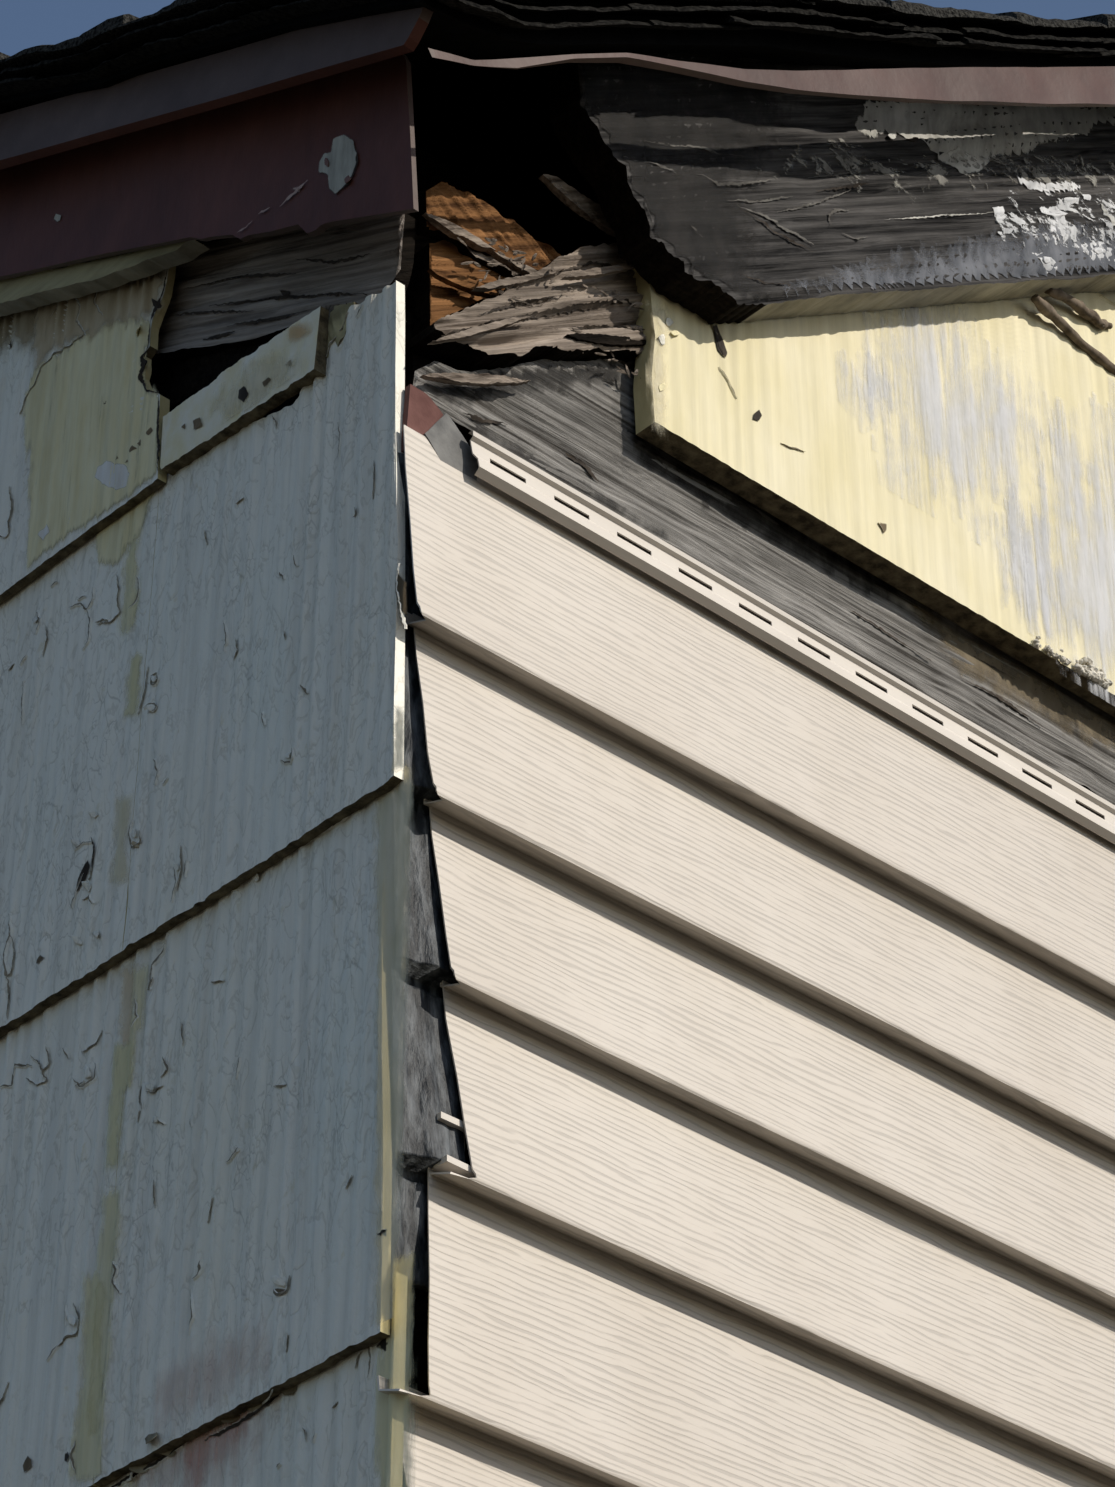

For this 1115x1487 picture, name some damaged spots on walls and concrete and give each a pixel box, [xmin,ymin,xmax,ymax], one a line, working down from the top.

peeling [319,135,358,194]
peeling [785,100,1115,273]
spalling [325,302,364,358]
leakage [428,360,635,402]
peeling [19,272,167,631]
leakage [469,424,621,514]
leakage [633,433,896,601]
spalling [395,563,408,629]
leakage [915,605,1115,745]
peeling [69,838,95,908]
peeling [69,1193,184,1487]
peeling [205,1385,297,1441]